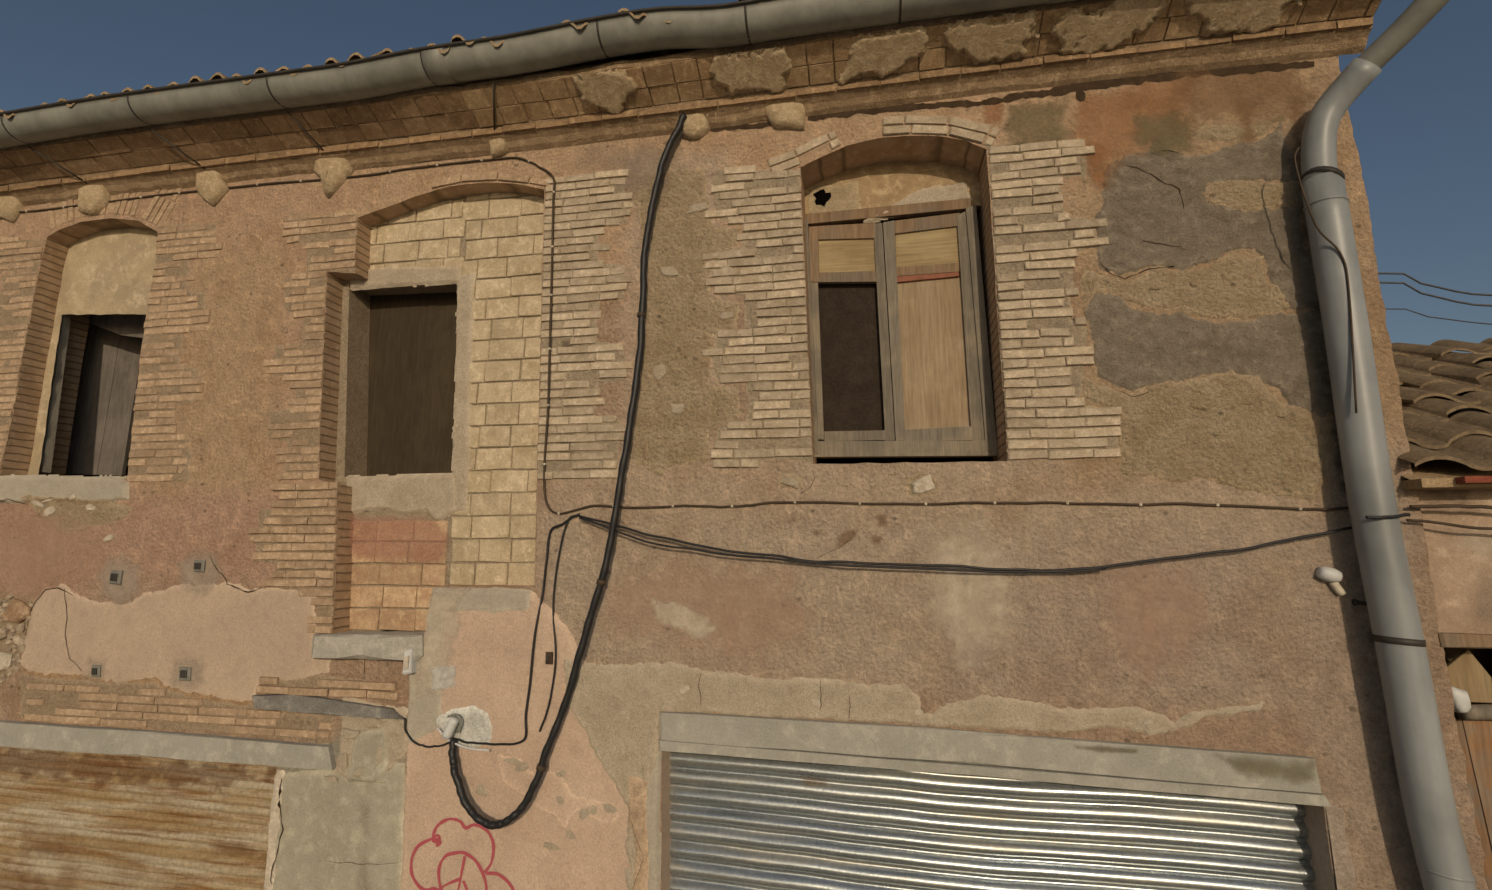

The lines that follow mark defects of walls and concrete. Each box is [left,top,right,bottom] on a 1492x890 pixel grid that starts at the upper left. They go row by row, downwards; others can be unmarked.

peeling [572,69,639,115]
peeling [709,45,793,96]
spalling [1206,180,1304,212]
spalling [1080,251,1291,321]
crack [25,587,82,671]